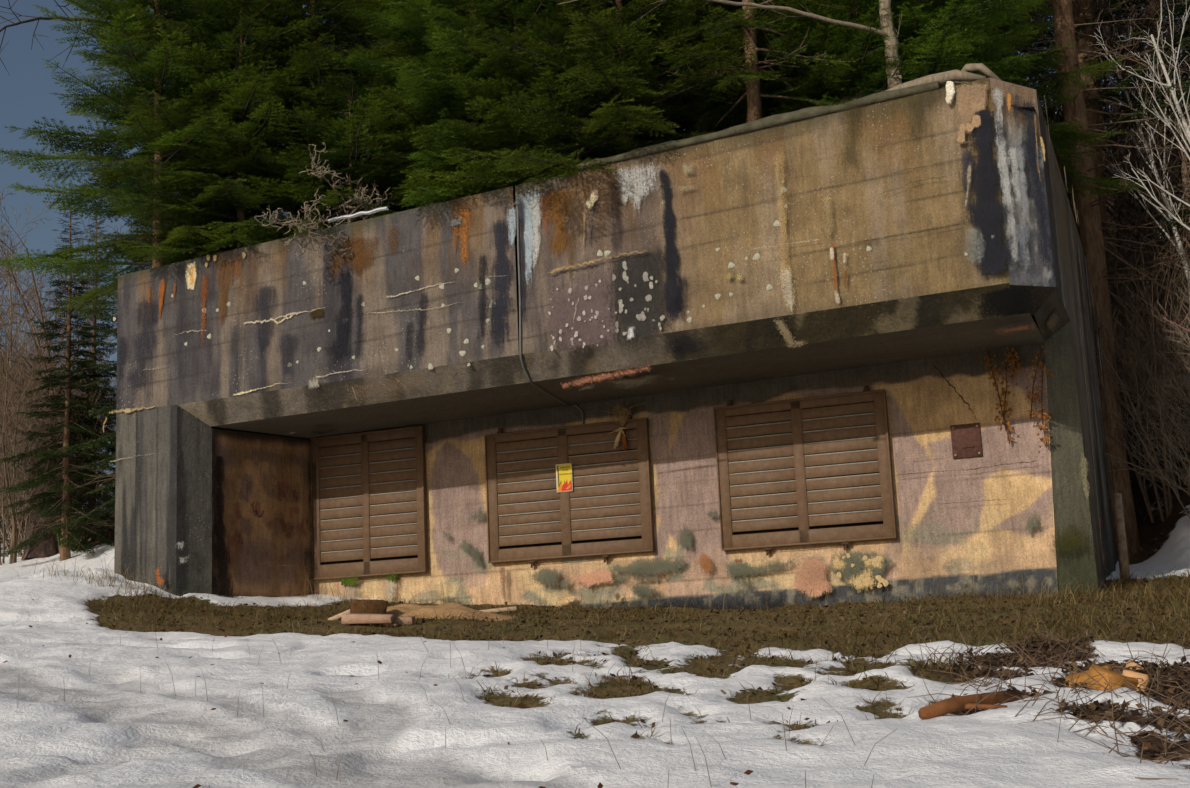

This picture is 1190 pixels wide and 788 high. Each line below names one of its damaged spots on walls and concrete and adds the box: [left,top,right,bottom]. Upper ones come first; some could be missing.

spalling [945,81,988,144]
damp [961,89,1054,276]
damp [331,270,362,363]
rust [453,208,471,262]
damp [477,192,543,351]
peeling [548,261,665,351]
damp [618,163,693,320]
damp [973,285,1039,319]